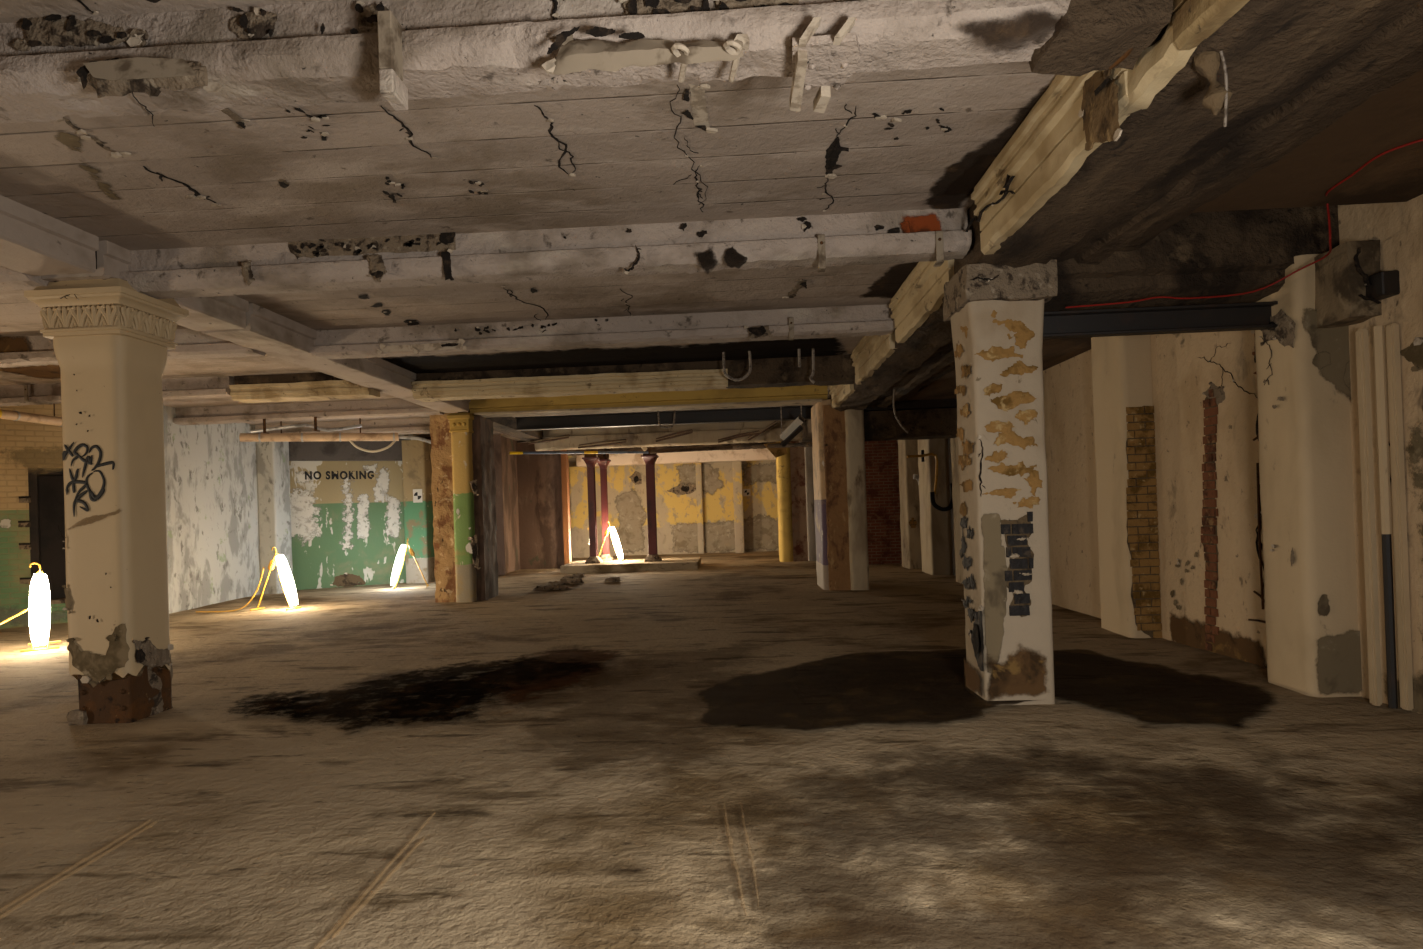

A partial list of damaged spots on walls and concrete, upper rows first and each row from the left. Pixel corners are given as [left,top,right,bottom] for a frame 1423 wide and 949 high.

crack [77,0,99,15]
spalling [542,0,799,75]
crack [534,105,576,177]
crack [670,85,708,212]
spalling [1078,70,1122,151]
peeling [339,464,402,550]
peeling [615,489,646,554]
peeling [671,514,779,553]
peeling [954,310,1043,672]
flaking render [1126,382,1225,651]
crack [1199,336,1273,623]
spalling [66,616,174,683]